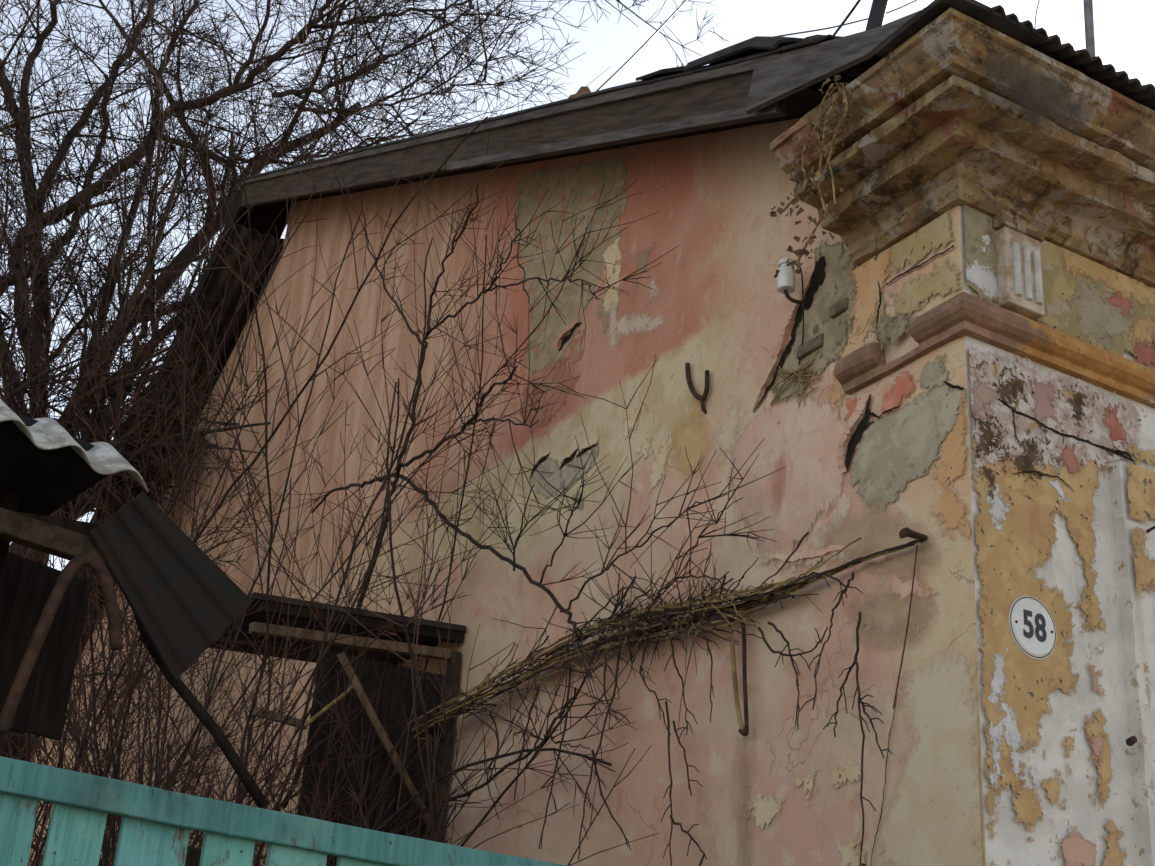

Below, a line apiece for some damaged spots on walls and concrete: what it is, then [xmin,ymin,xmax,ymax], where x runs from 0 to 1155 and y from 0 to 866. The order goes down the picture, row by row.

flaking render [746,204,1155,420]
crack [837,394,903,474]
damp [969,346,1141,499]
crack [998,399,1136,491]
peeling [849,349,1155,866]
peeling [740,760,861,829]
peeling [833,838,867,866]